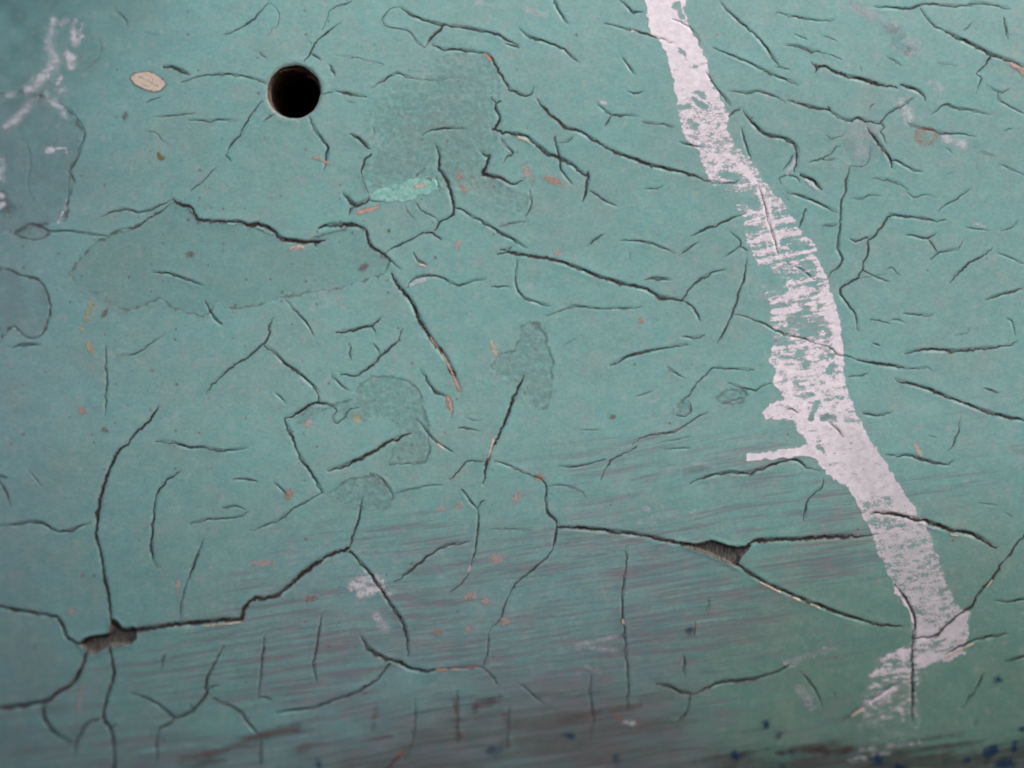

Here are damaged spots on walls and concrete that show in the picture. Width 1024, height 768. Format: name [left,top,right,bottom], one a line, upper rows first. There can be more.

crack [101,0,1024,480]
crack [0,317,692,768]
crack [656,599,822,728]
crack [690,459,1024,722]